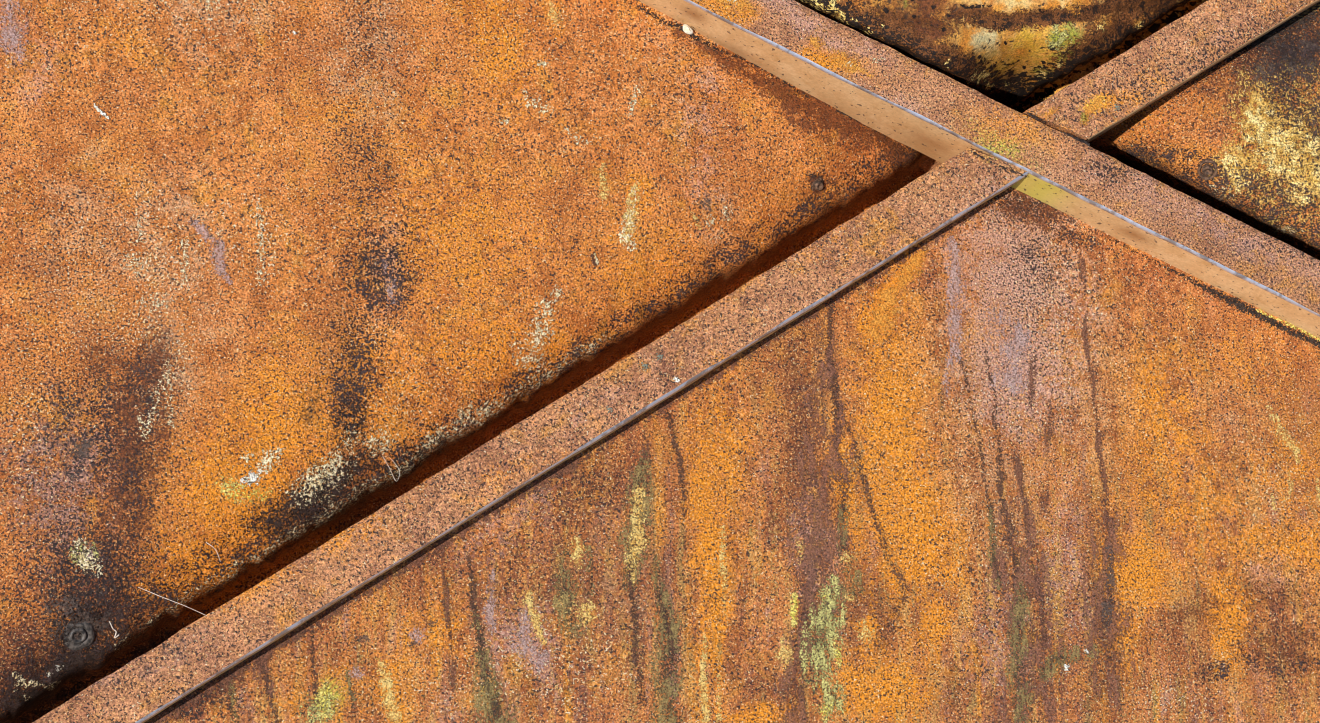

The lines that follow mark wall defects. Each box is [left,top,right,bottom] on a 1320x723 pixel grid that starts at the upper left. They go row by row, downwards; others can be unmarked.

rust [907,0,961,49]
rust [624,0,916,167]
rust [802,172,838,204]
rust [864,246,927,345]
leakage [145,202,1135,723]
rust [522,536,600,646]
rust [719,526,728,615]
rust [774,592,800,669]
rust [834,551,864,605]
rust [857,619,875,647]
rust [376,657,402,723]
rust [698,633,722,723]